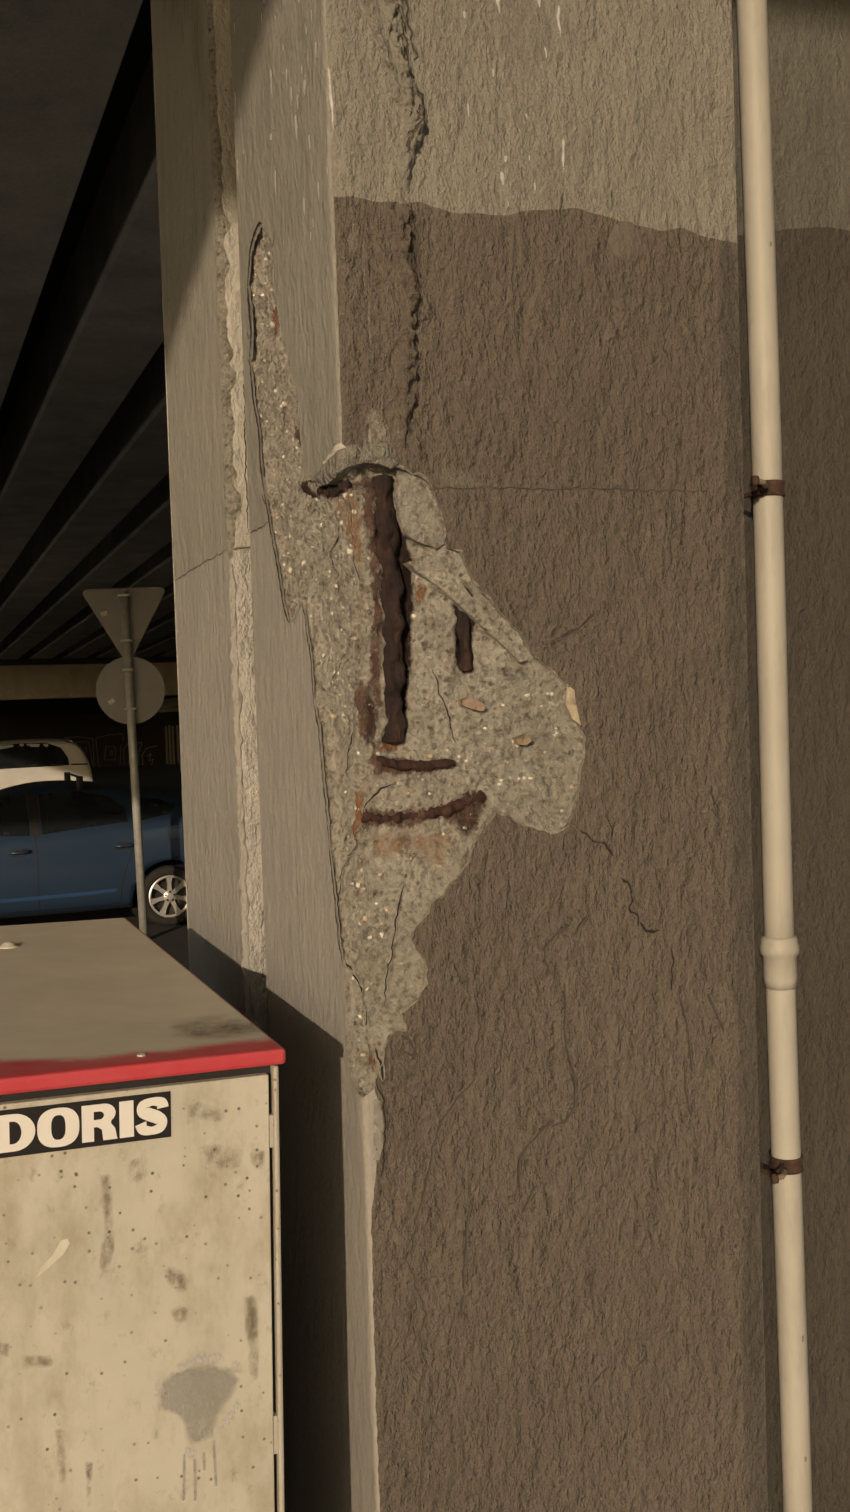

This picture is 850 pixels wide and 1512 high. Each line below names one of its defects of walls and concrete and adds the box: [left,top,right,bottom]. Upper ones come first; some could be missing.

crack [175,217,344,967]
corrosion [302,475,455,776]
spalling [206,0,586,1178]
corrosion [452,587,475,673]
corrosion [352,792,486,843]
crack [580,830,674,991]
crack [406,962,483,1512]